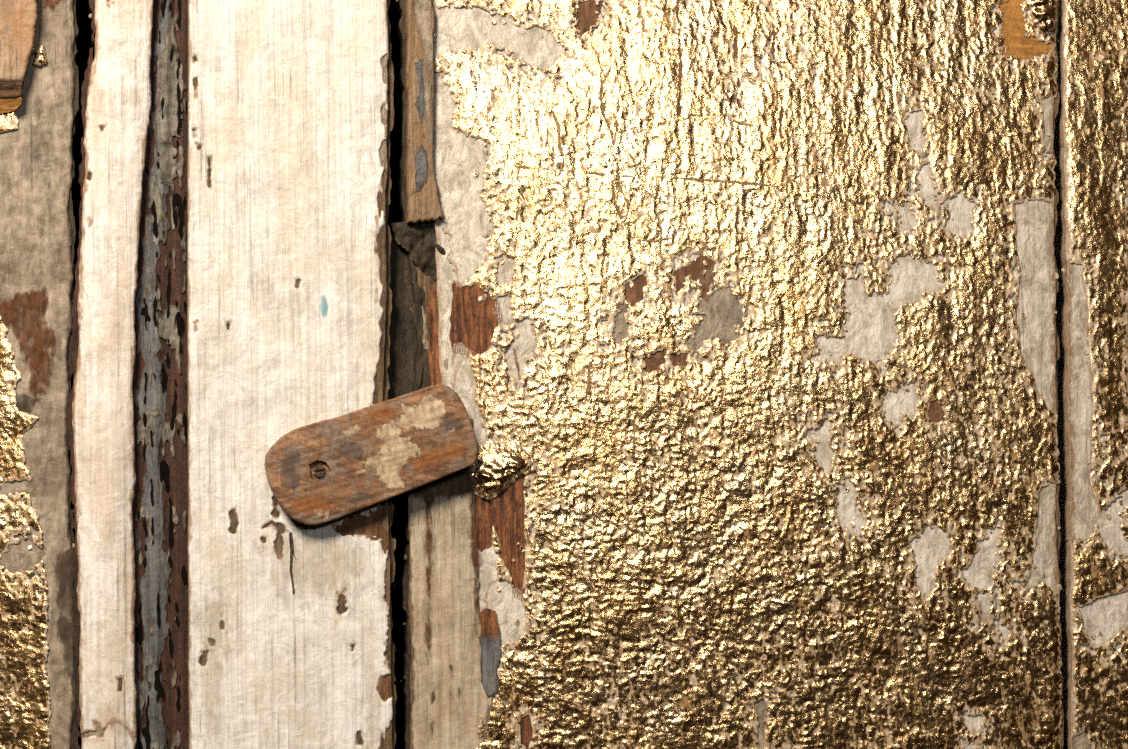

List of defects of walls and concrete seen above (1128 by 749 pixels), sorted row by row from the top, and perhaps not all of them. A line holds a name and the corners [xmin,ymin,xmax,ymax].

peeling [433,3,566,71]
peeling [904,110,926,157]
peeling [939,190,975,238]
peeling [433,72,537,448]
peeling [612,274,647,343]
peeling [643,254,745,373]
peeling [810,254,946,364]
peeling [1013,198,1128,592]
peeling [909,523,952,597]